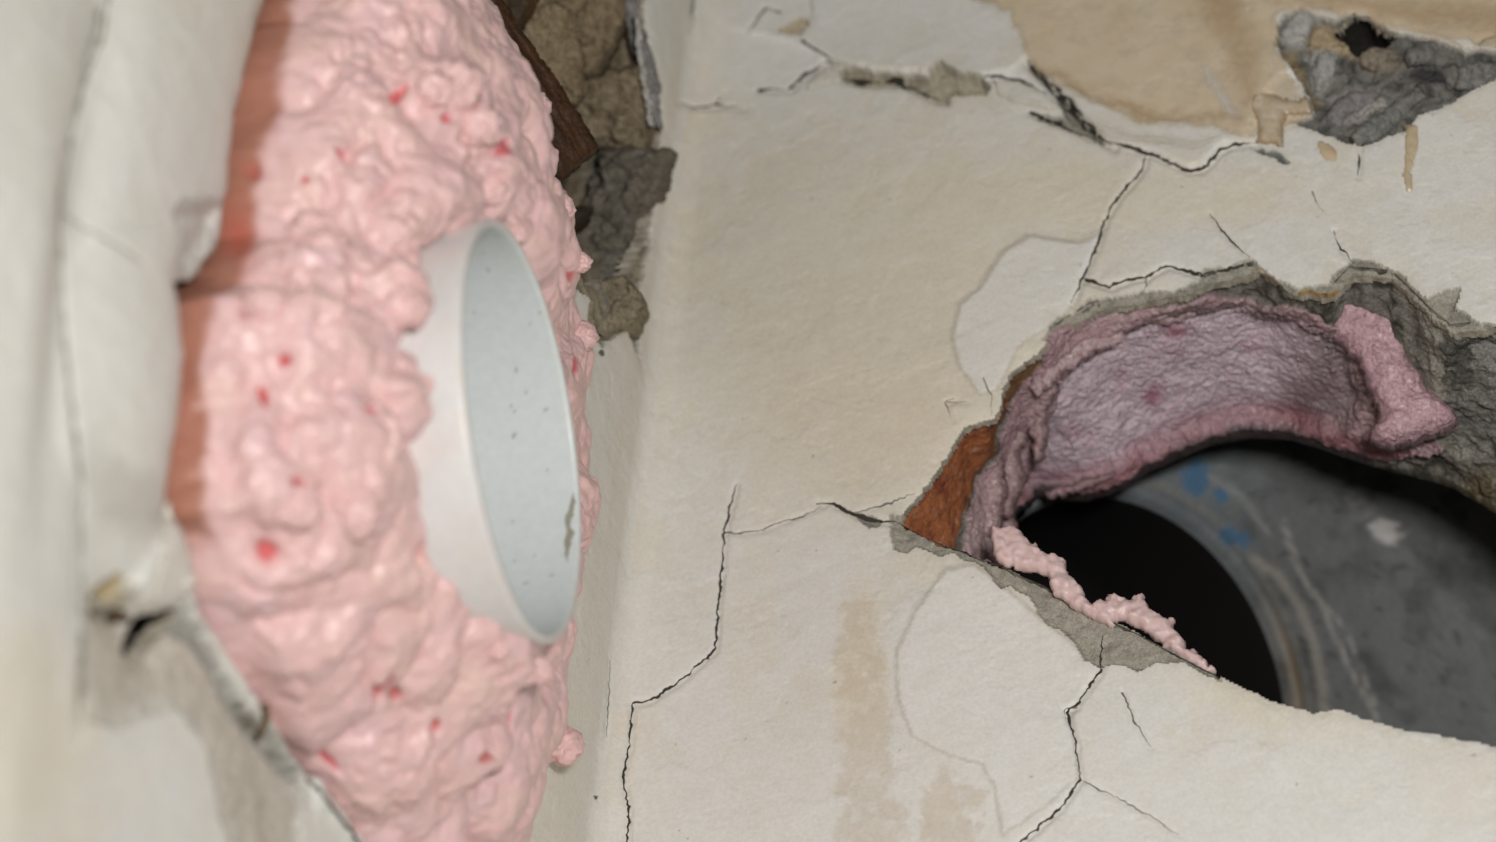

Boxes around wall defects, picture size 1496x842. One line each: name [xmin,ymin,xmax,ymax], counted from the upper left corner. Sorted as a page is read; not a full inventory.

spalling [561,149,600,207]
peeling [574,240,653,366]
crack [679,1,940,109]
flaking render [838,57,1106,147]
crack [984,61,1250,303]
water stain [983,0,1496,149]
crack [1311,191,1354,264]
spalling [1251,8,1496,165]
spalling [854,258,1496,682]
flaking render [77,500,311,842]
crack [606,484,912,842]
crack [1020,636,1175,842]